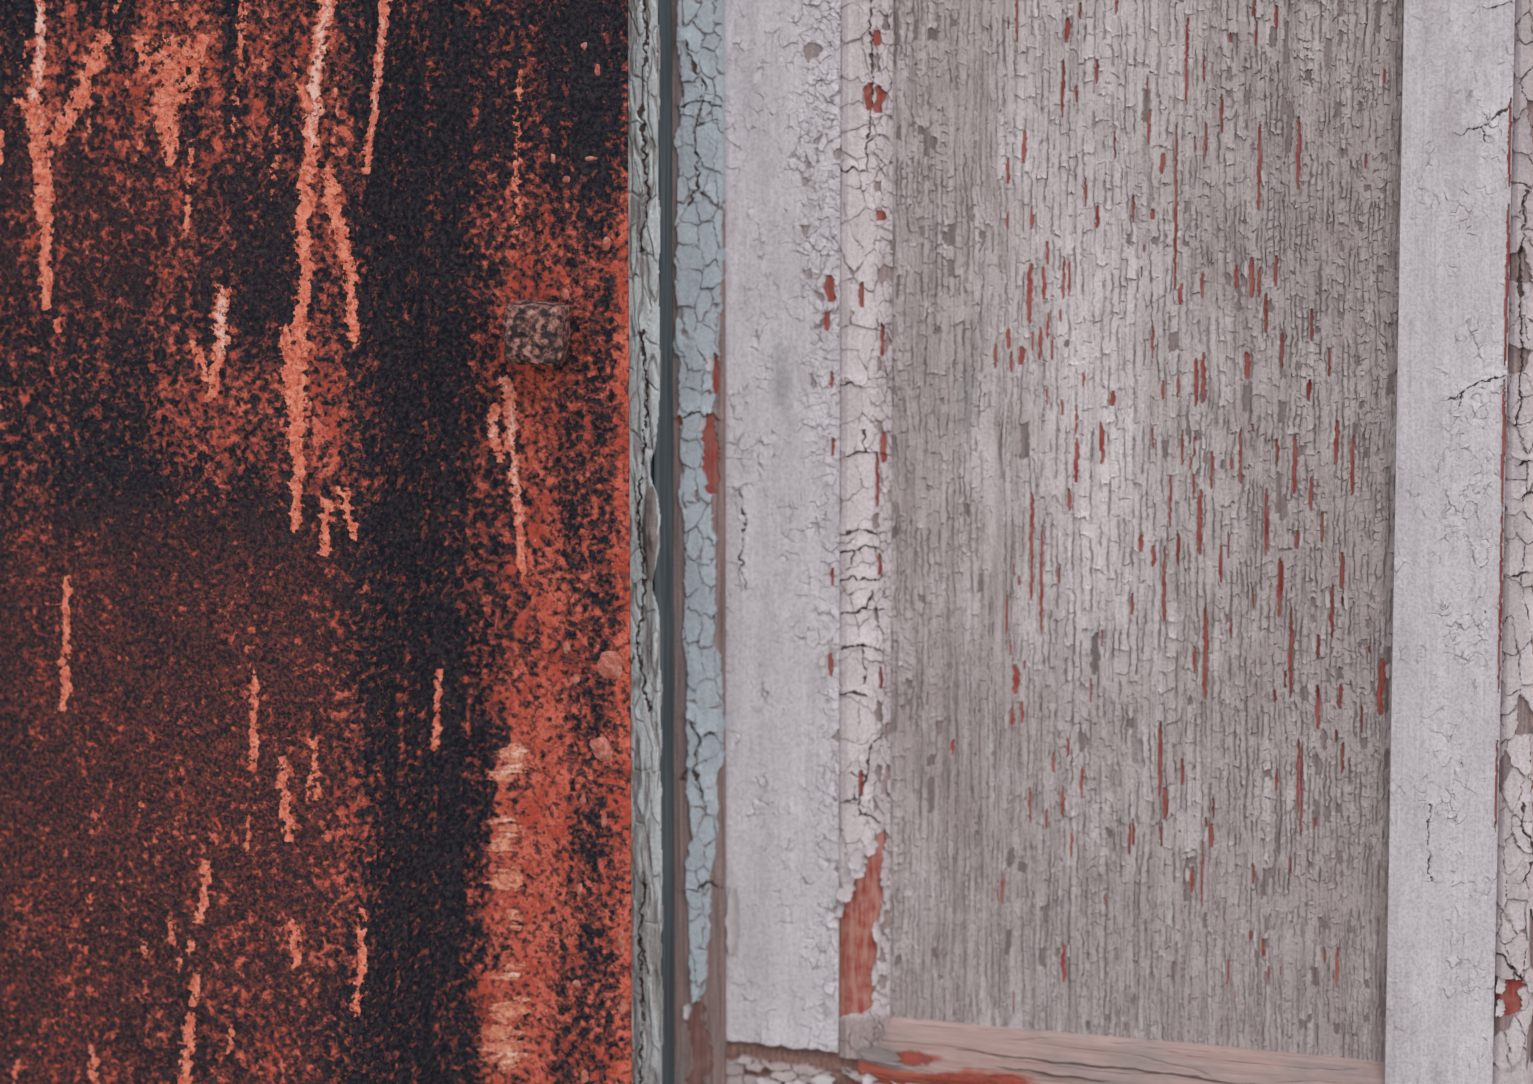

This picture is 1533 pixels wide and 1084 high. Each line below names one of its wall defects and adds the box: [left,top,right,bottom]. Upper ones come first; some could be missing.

corrosion [13,0,213,333]
corrosion [189,282,234,403]
corrosion [230,0,362,557]
corrosion [360,0,393,174]
corrosion [486,358,528,581]
crack [841,0,880,173]
crack [847,430,887,457]
peeling [993,242,1076,373]
peeling [1146,77,1223,305]
peeling [1138,424,1254,620]
peeling [1497,98,1512,689]
peeling [836,829,887,1018]